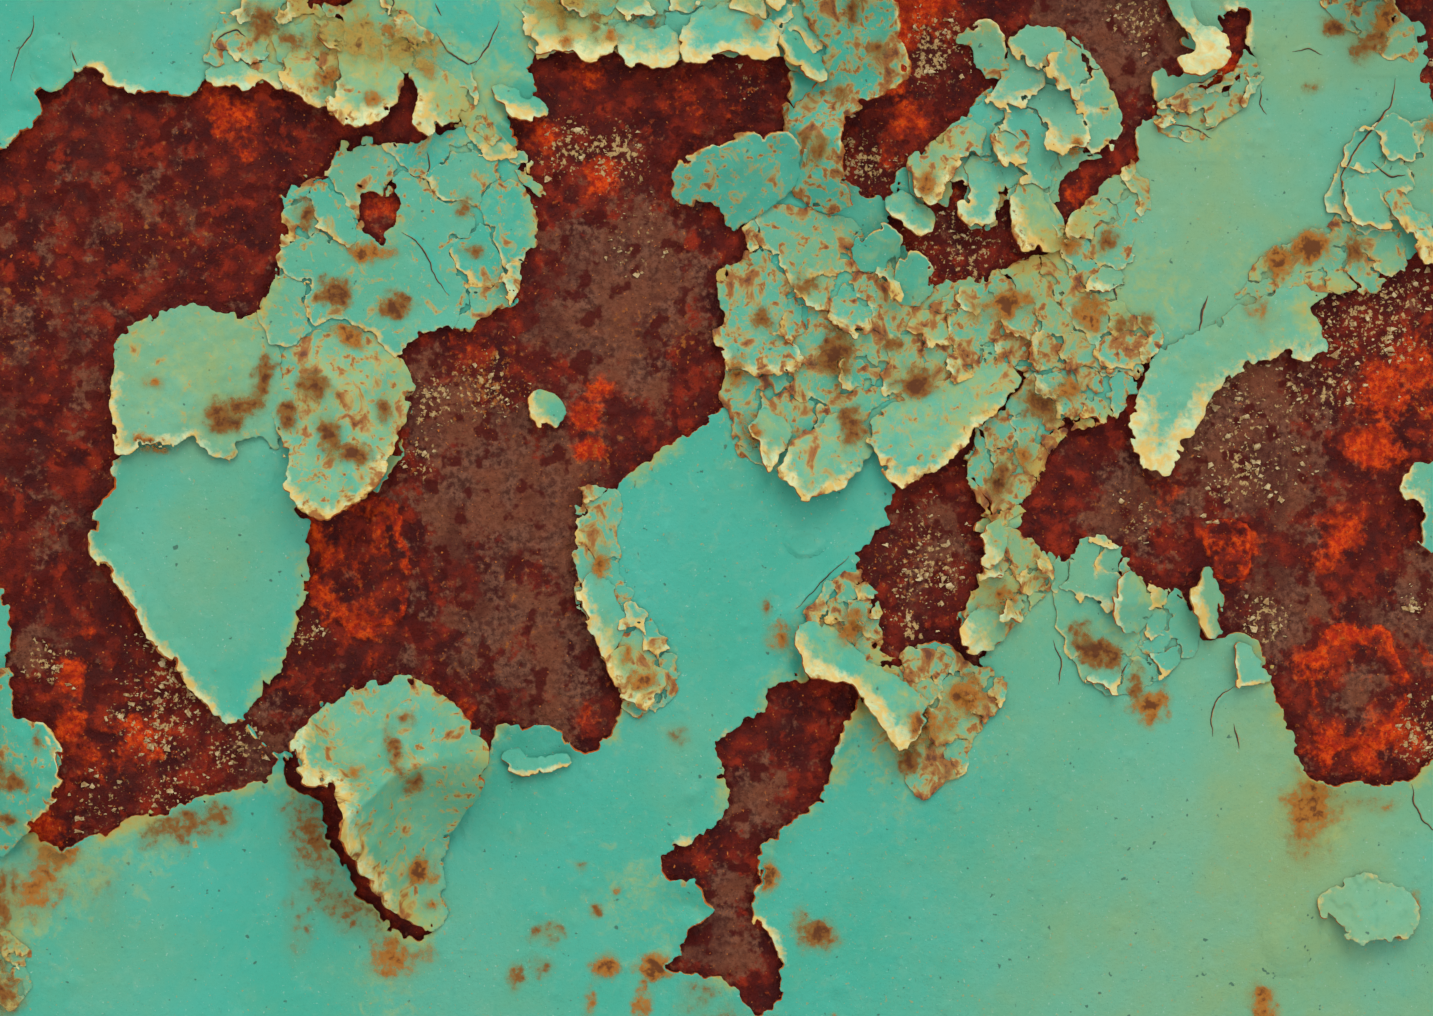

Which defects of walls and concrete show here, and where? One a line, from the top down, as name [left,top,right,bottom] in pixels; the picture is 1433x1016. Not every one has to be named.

crack [426,151,436,178]
corrosion [989,125,1030,168]
crack [402,229,451,295]
corrosion [1266,228,1331,280]
corrosion [204,353,279,434]
corrosion [316,420,373,465]
corrosion [1068,620,1125,670]
corrosion [1127,673,1170,726]
corrosion [501,748,571,777]
corrosion [409,859,440,885]
corrosion [797,912,838,950]
peeling [1317,872,1420,946]